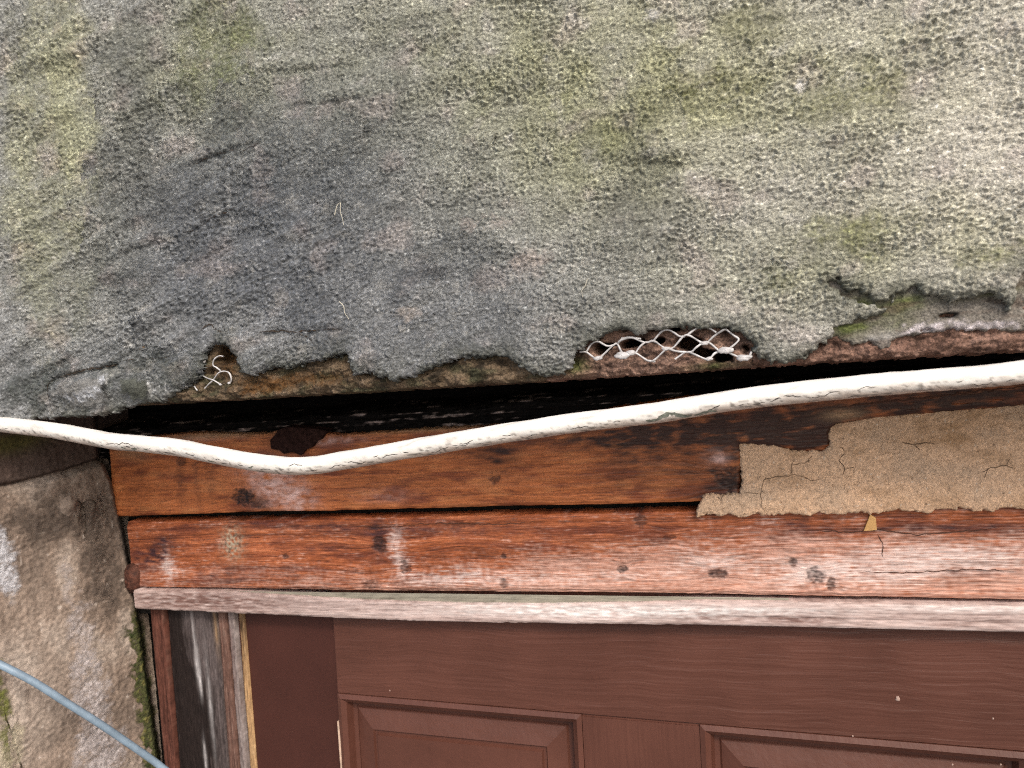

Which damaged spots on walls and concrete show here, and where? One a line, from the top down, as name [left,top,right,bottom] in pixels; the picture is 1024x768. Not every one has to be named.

spalling [120,272,1024,406]
crack [718,447,854,511]